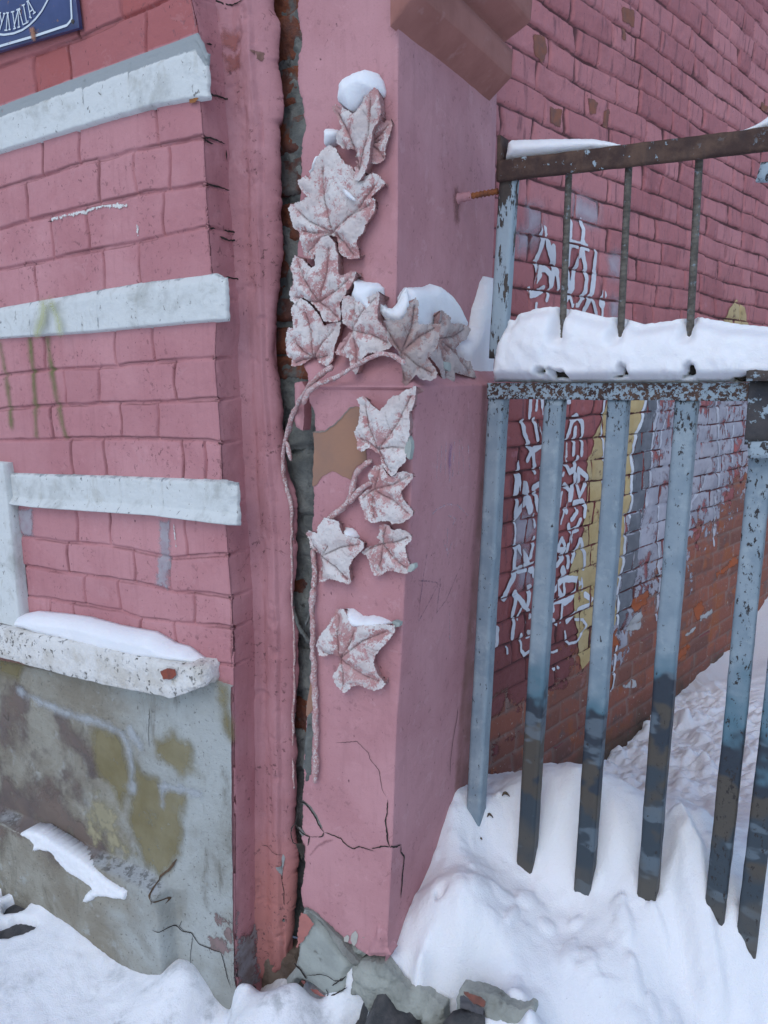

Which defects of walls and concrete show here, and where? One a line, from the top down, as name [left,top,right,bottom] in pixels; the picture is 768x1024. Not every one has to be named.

crack [264,0,405,937]
peeling [312,406,367,486]
peeling [675,459,749,697]
peeling [758,518,768,611]
peeling [488,686,526,774]
peeling [543,645,590,764]
peeling [604,559,662,760]
crack [148,859,231,987]
peeling [207,911,261,986]
spalling [296,907,366,966]